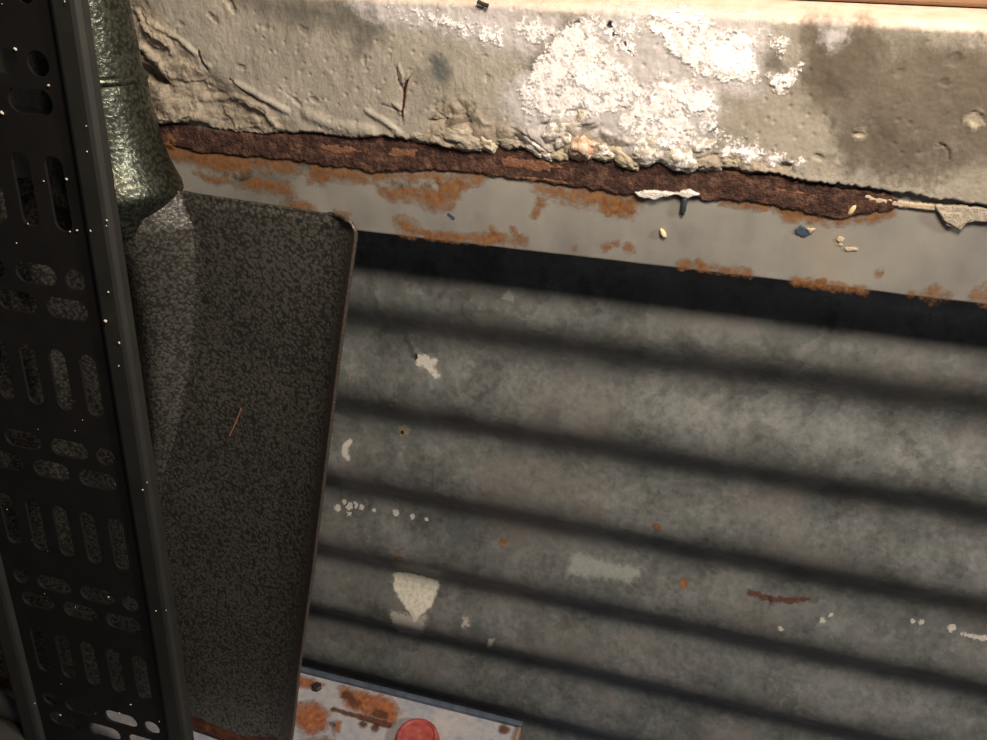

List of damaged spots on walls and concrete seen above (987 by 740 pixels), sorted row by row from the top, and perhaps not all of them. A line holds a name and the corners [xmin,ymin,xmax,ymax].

spalling [130,0,296,135]
leakage [335,0,987,181]
spalling [426,98,634,161]
rust [158,123,898,225]
spalling [692,151,793,178]
peeling [865,195,987,230]
rust [747,590,810,604]